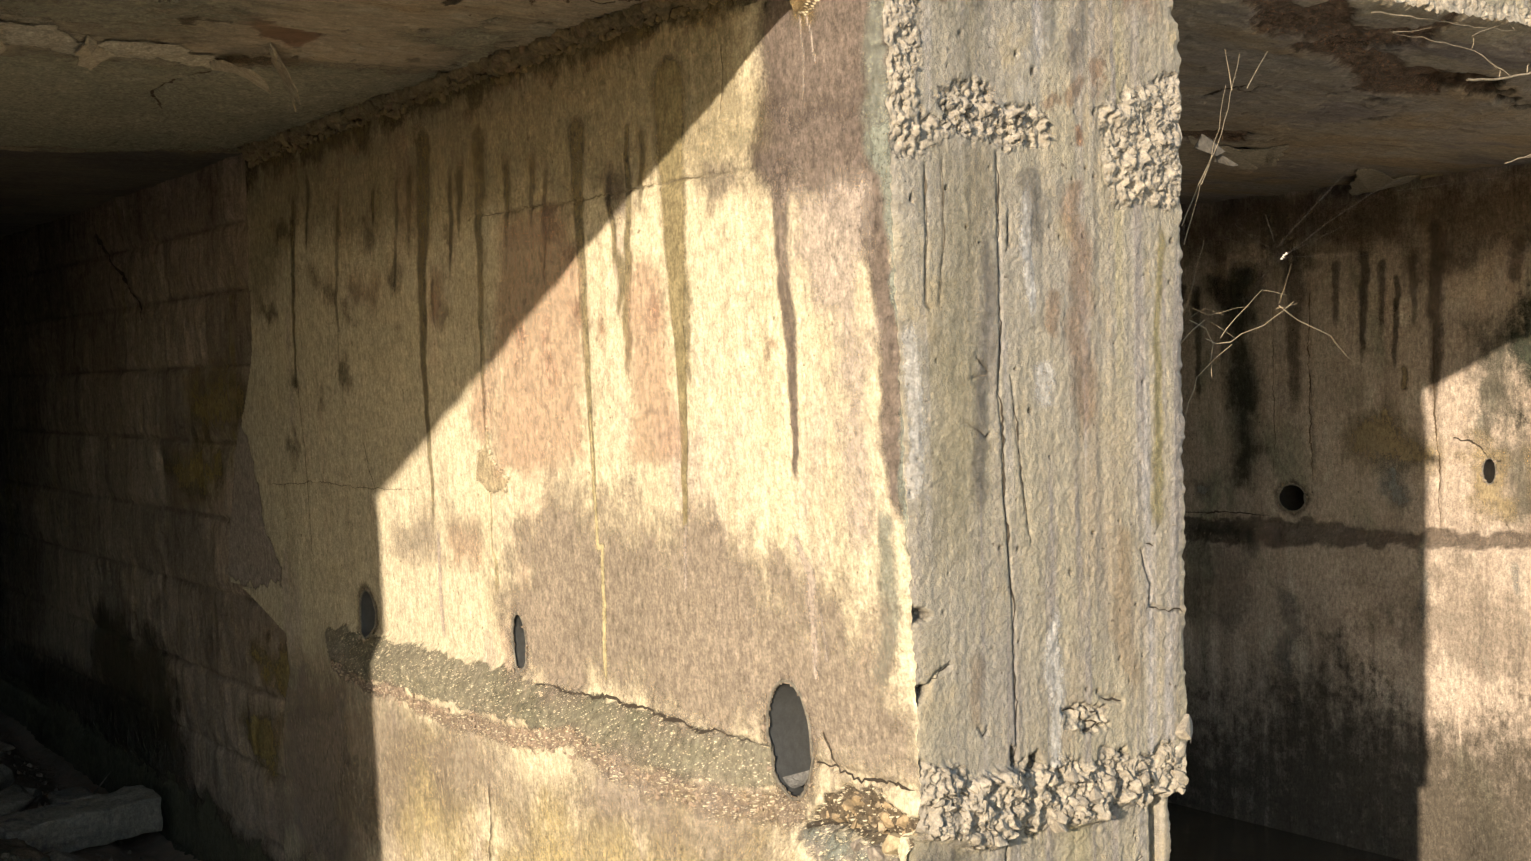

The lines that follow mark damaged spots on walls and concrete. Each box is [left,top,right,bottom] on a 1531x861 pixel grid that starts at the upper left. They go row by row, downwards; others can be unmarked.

spalling [0,0,757,190]
leakage [1020,190,1036,312]
leakage [1179,170,1531,399]
leakage [239,0,925,861]
leakage [1345,405,1439,508]
leakage [1470,432,1516,520]
spalling [329,659,900,861]
crack [536,683,770,746]
crack [816,731,914,791]
spalling [1010,753,1035,773]
leakage [1168,633,1531,861]
crack [806,819,884,836]